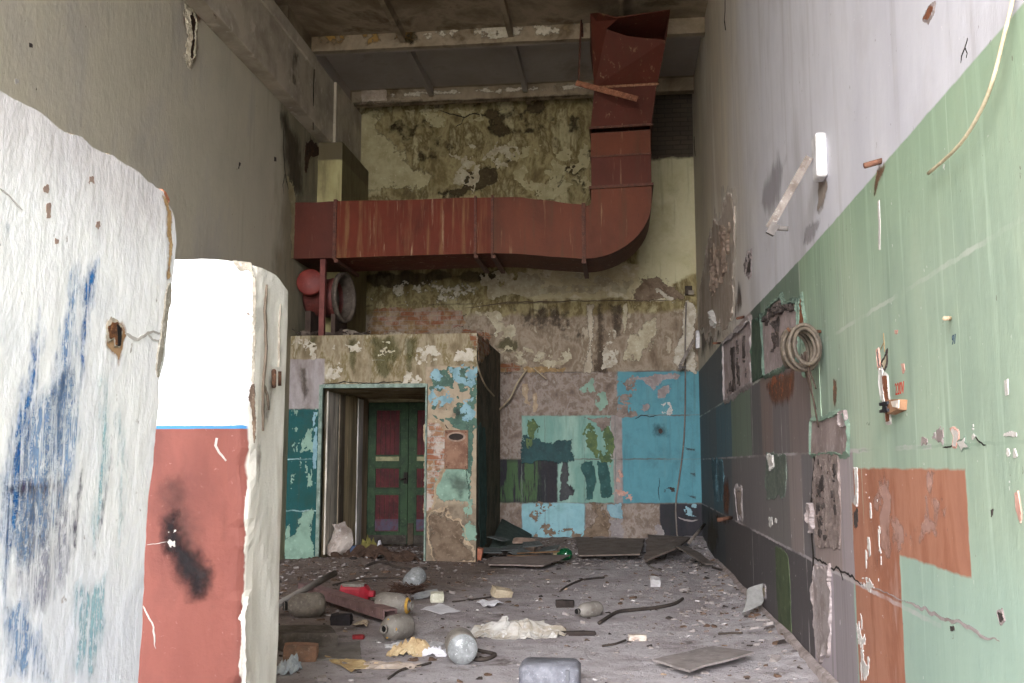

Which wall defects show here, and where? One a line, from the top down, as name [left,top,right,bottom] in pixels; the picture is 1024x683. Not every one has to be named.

spalling [183,2,199,70]
leakage [390,119,431,140]
leakage [388,90,461,104]
leakage [474,84,586,138]
leakage [438,166,498,198]
crack [125,330,161,342]
peeling [332,185,814,562]
spalling [804,409,859,550]
spalling [809,563,832,664]
crack [811,533,999,641]